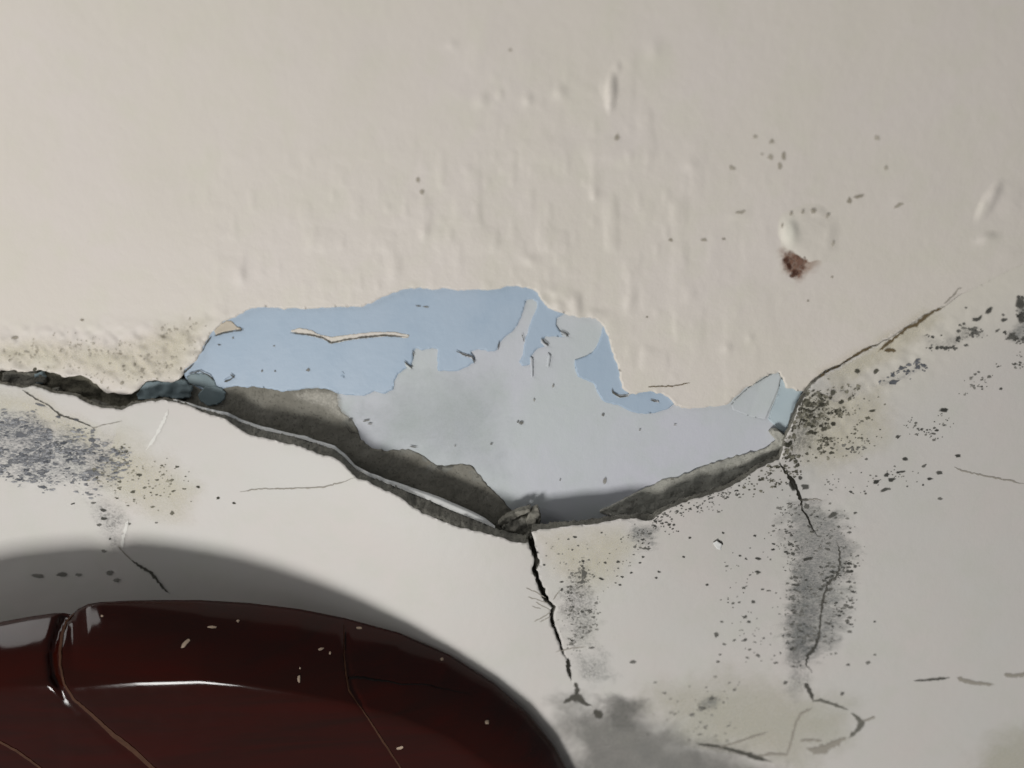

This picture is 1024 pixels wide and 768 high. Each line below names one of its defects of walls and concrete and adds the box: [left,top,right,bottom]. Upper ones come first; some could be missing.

corrosion [783,252,810,278]
crack [0,367,193,429]
damp [0,403,200,526]
peeling [3,286,804,530]
mould [546,369,942,667]
crack [788,288,961,425]
mould [874,359,928,385]
mould [896,408,954,441]
mould [925,295,1024,369]
crack [527,540,603,718]
crack [698,462,875,762]
crack [916,677,993,686]